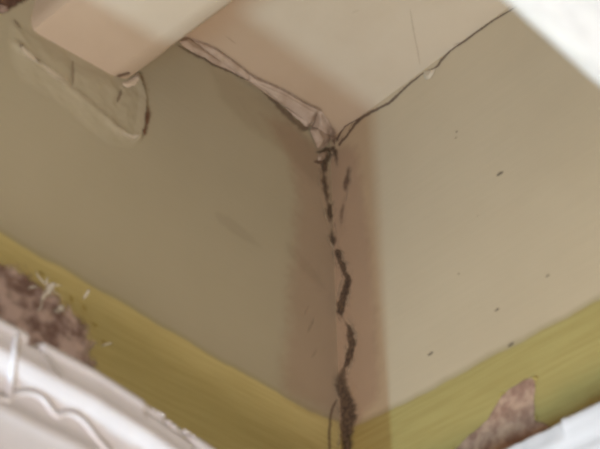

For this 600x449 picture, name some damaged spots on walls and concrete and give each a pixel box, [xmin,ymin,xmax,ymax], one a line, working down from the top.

flaking render [179,37,332,149]
crack [315,8,513,219]
flaking render [0,265,97,368]
crack [330,235,356,449]
flaking render [451,377,550,449]